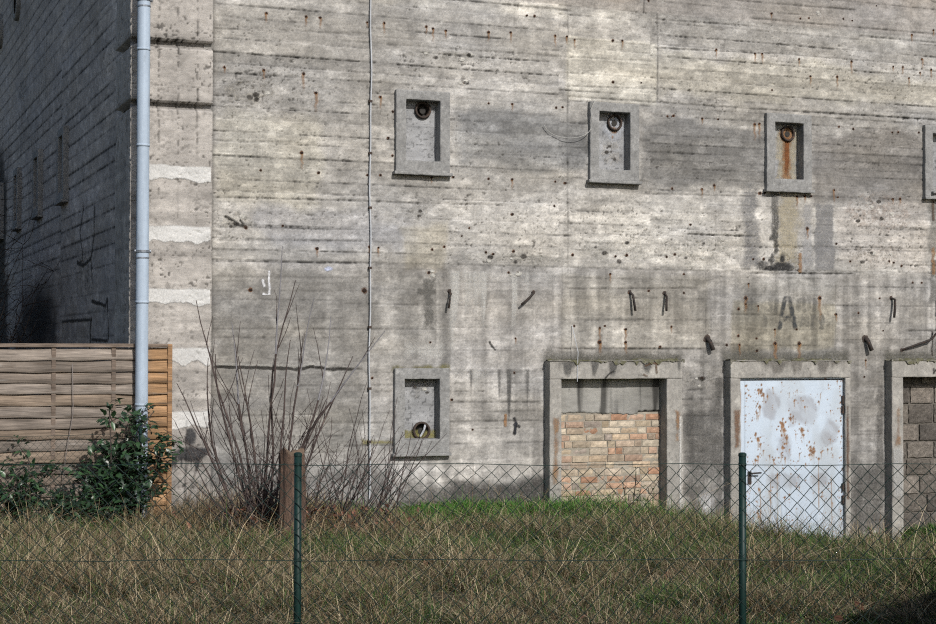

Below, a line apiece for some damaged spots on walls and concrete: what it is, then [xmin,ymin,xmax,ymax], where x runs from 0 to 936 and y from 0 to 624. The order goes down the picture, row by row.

rust [776,128,797,179]
water stain [769,193,835,270]